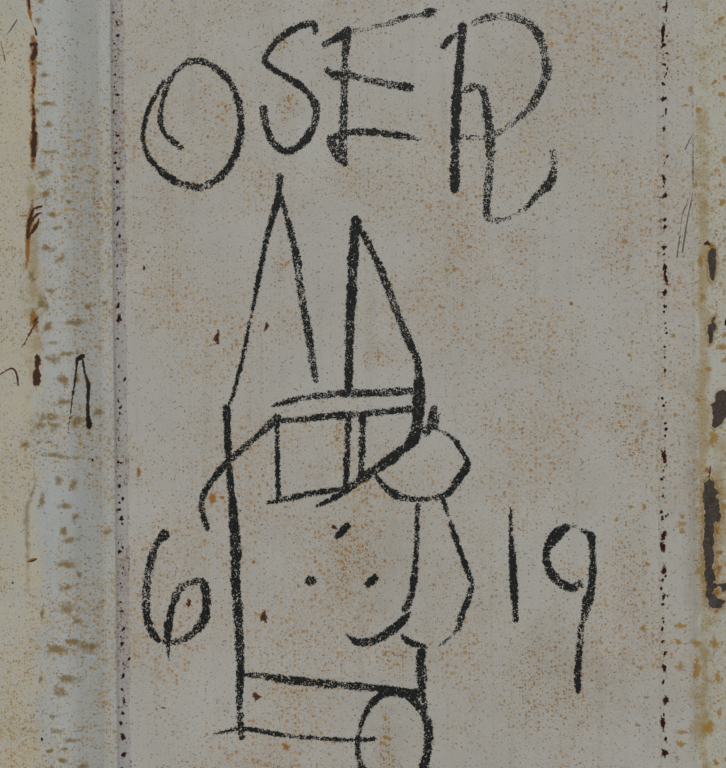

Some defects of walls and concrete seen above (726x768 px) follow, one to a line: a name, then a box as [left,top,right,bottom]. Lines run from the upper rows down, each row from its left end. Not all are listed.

rust [661,0,679,85]
rust [20,192,55,281]
rust [661,246,675,337]
peeling [709,389,726,444]
rust [603,384,669,684]
peeling [702,466,726,613]
rust [117,601,130,741]
rust [660,695,677,758]